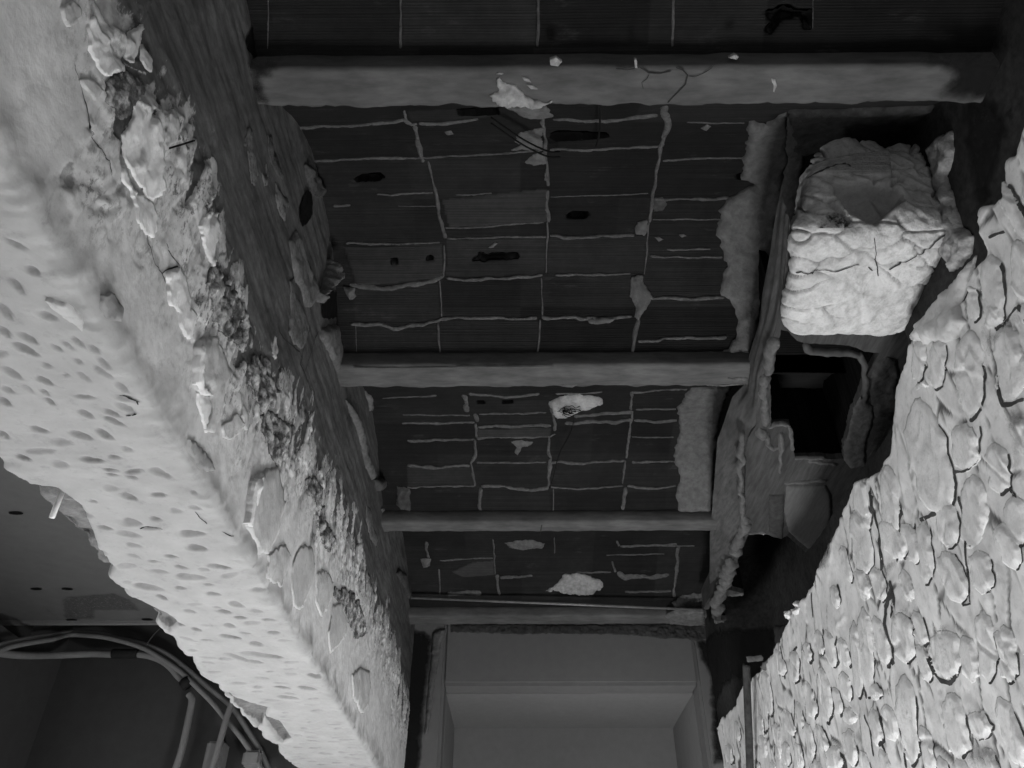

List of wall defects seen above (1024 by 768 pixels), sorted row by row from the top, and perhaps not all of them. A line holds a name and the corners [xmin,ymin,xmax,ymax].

peeling [60,0,180,238]
crack [796,234,945,276]
peeling [44,297,84,331]
spalling [99,292,124,321]
spalling [166,211,367,653]
crack [997,381,1024,407]
peeling [725,181,1024,768]
crack [913,426,982,530]
crack [811,488,898,657]
peeling [352,667,371,713]
crack [864,687,907,768]
crack [926,656,956,686]